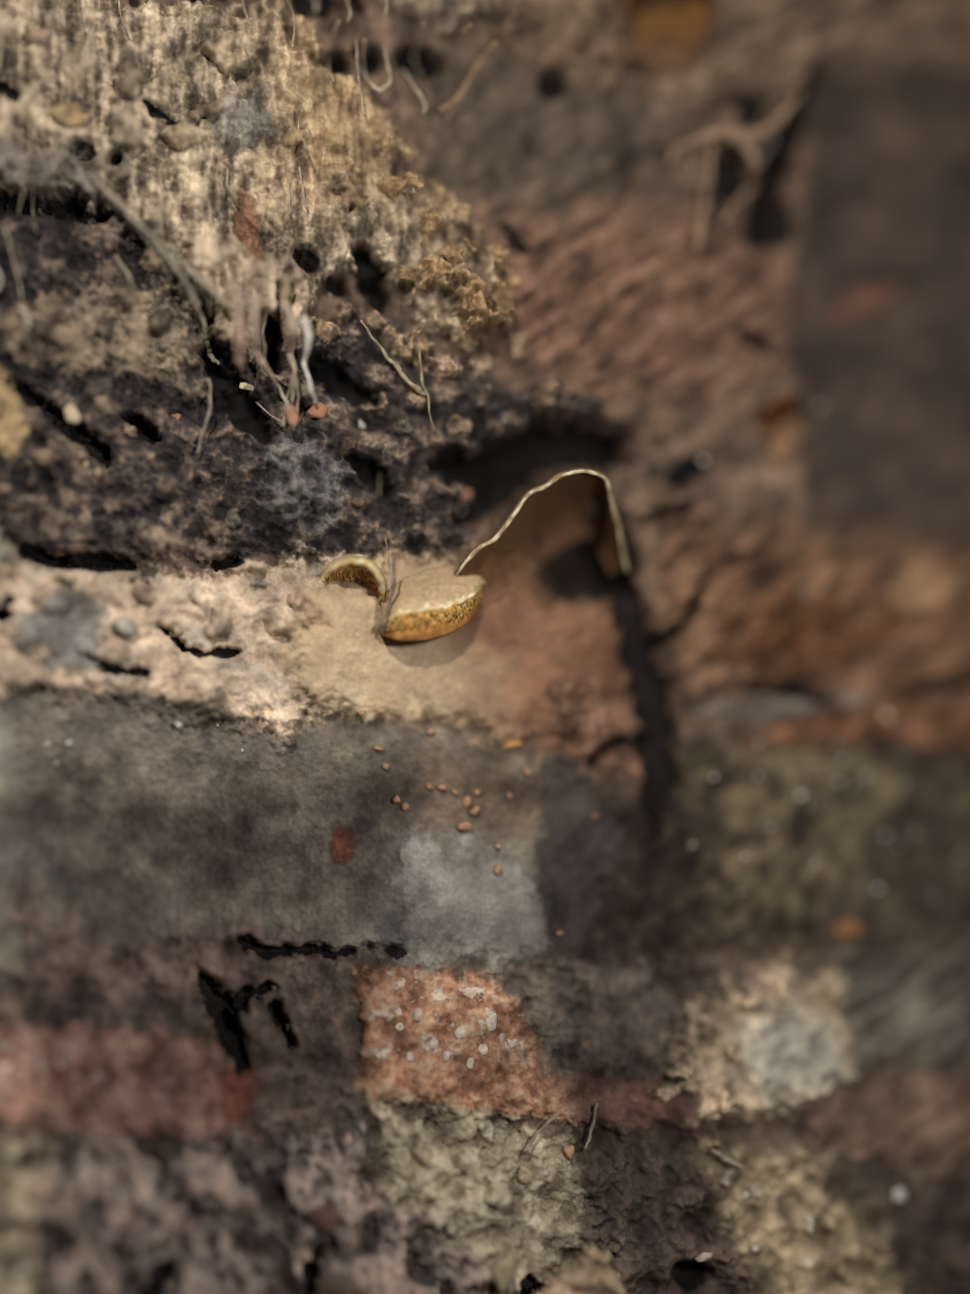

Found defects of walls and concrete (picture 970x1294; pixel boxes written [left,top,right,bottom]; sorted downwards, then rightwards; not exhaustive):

spalling [0,0,624,742]
crack [587,498,782,839]